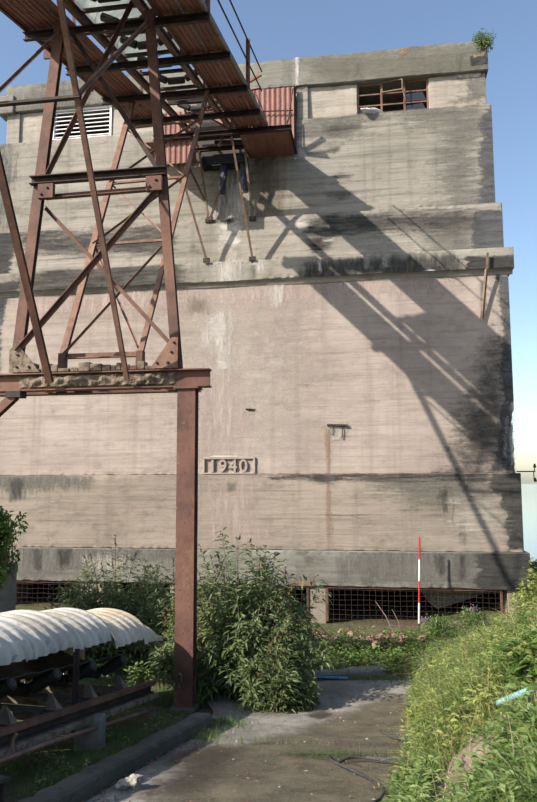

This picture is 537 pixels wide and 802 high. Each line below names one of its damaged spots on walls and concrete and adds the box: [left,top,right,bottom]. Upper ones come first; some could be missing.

water stain [39,225,163,255]
water stain [33,265,167,319]
water stain [175,104,531,590]
water stain [0,476,91,498]
water stain [15,548,176,578]